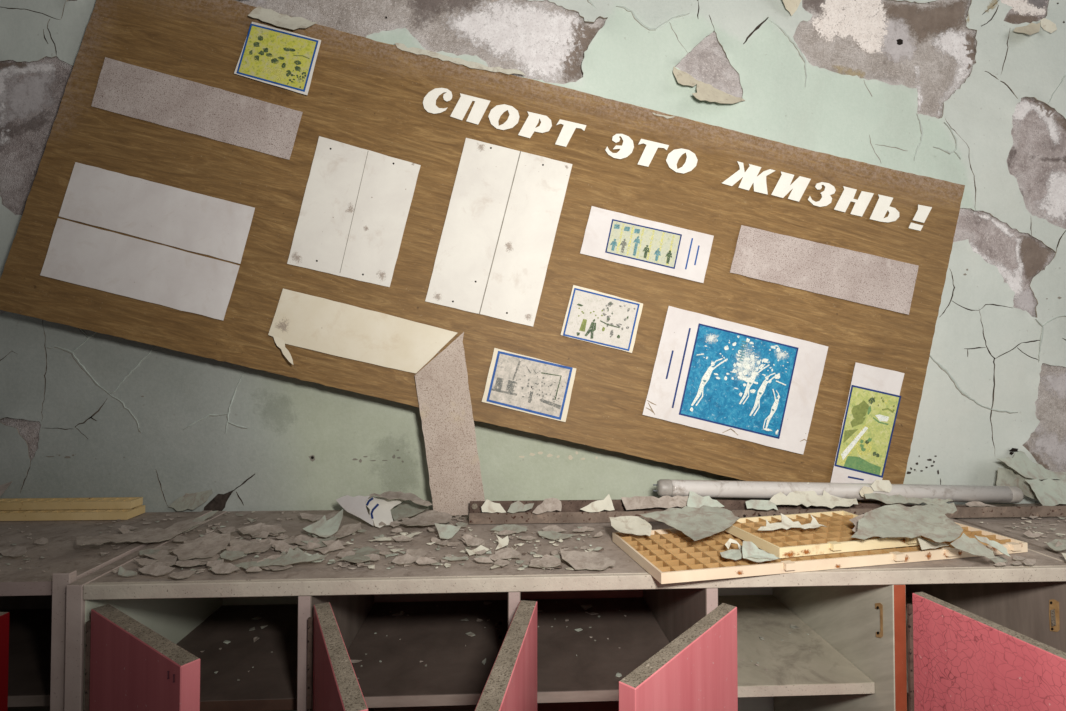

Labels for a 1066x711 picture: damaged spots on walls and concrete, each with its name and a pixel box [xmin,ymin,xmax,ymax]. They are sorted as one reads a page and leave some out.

crack [2,7,64,55]
peeling [235,0,607,84]
peeling [673,32,745,104]
peeling [782,0,977,119]
crack [982,1,1014,94]
peeling [1001,0,1065,35]
peeling [0,56,73,215]
peeling [1007,97,1066,229]
peeling [953,208,1061,317]
crack [44,328,156,439]
crack [942,273,1066,445]
peeling [996,363,1066,506]